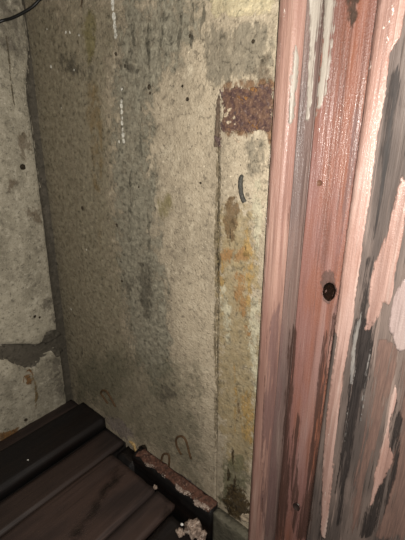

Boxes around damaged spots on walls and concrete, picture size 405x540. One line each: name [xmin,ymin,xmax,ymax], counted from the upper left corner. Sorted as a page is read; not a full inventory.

corrosion [223,197,240,242]
corrosion [219,229,254,317]
mould [219,450,250,522]